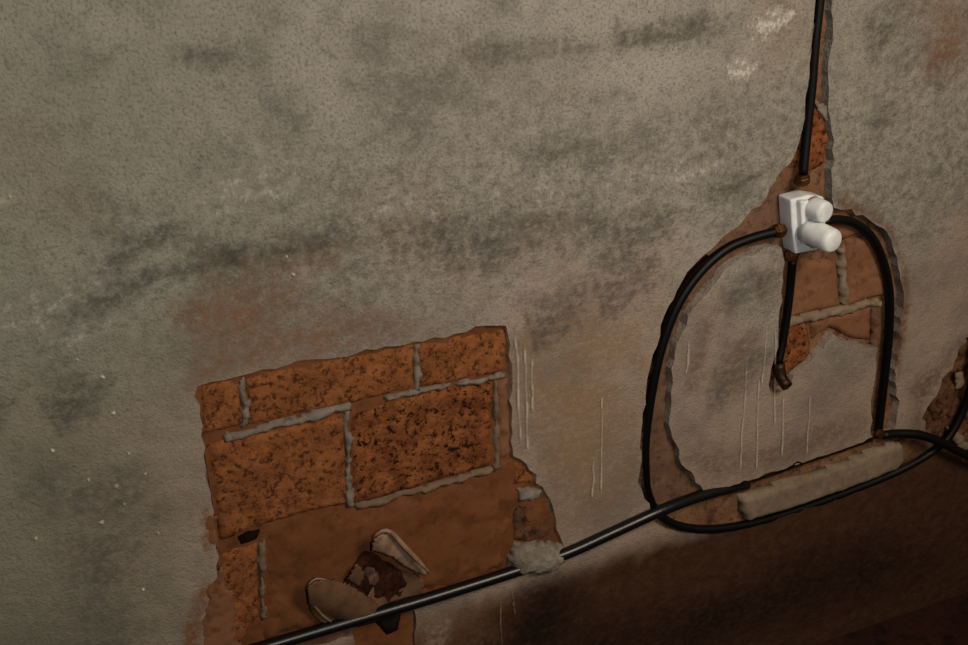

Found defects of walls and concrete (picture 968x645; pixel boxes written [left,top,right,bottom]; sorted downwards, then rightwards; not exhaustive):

leakage [727,56,758,83]
leakage [747,4,795,40]
leakage [511,154,737,206]
flaking render [769,158,897,432]
flaking render [922,338,968,451]
flaking render [195,326,560,645]